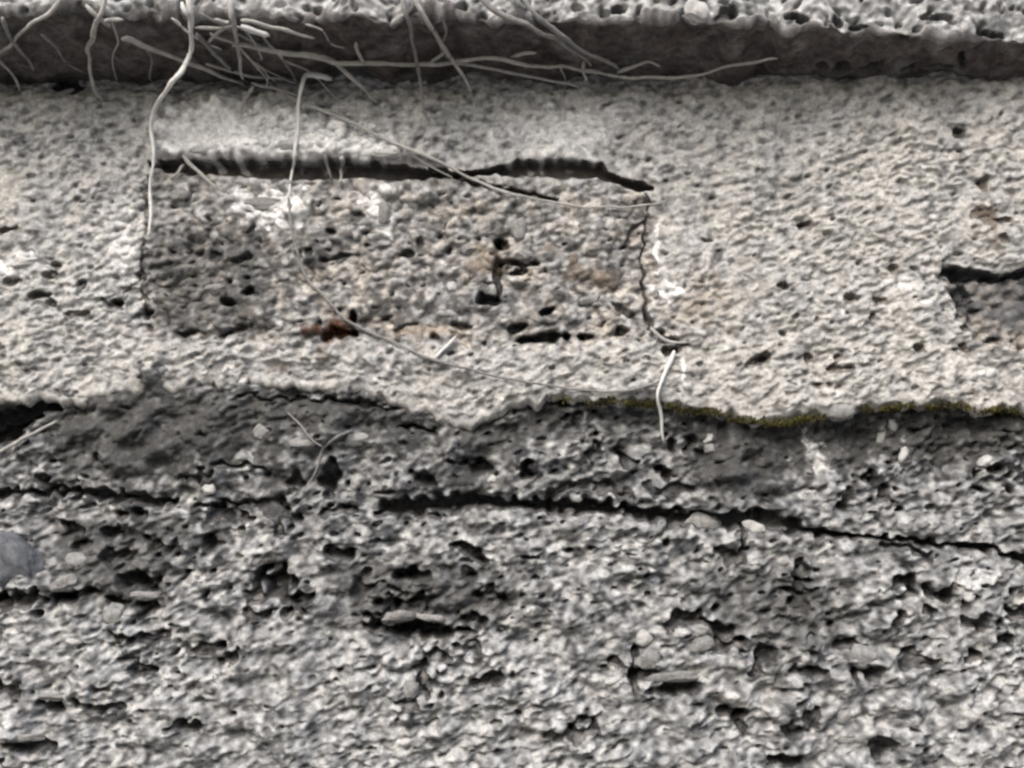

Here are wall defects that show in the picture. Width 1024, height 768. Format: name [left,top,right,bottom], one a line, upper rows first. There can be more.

spalling [96,88,659,351]
crack [100,157,691,353]
spalling [28,290,90,320]
crack [0,459,267,511]
spalling [258,456,359,538]
spalling [408,469,438,489]
spalling [521,458,534,479]
spalling [642,465,695,499]
crack [373,479,1024,567]
water stain [667,407,1024,512]
spalling [836,470,896,511]
spalling [449,541,508,601]